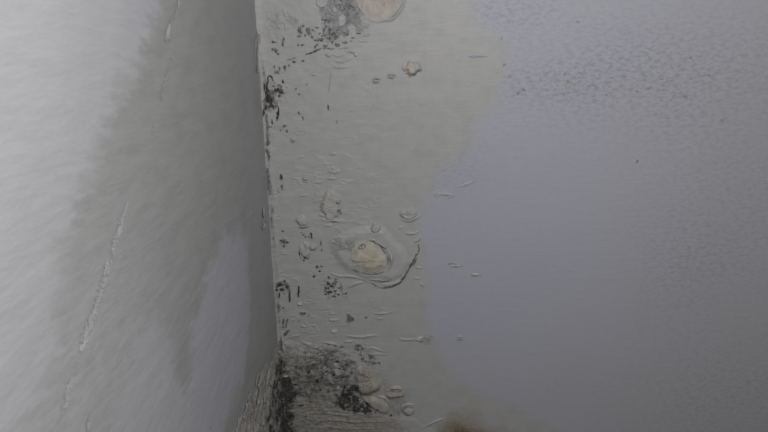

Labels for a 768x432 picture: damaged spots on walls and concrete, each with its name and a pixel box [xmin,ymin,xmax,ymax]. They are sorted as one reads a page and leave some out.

damp [0,0,574,432]
flaking render [316,0,406,44]